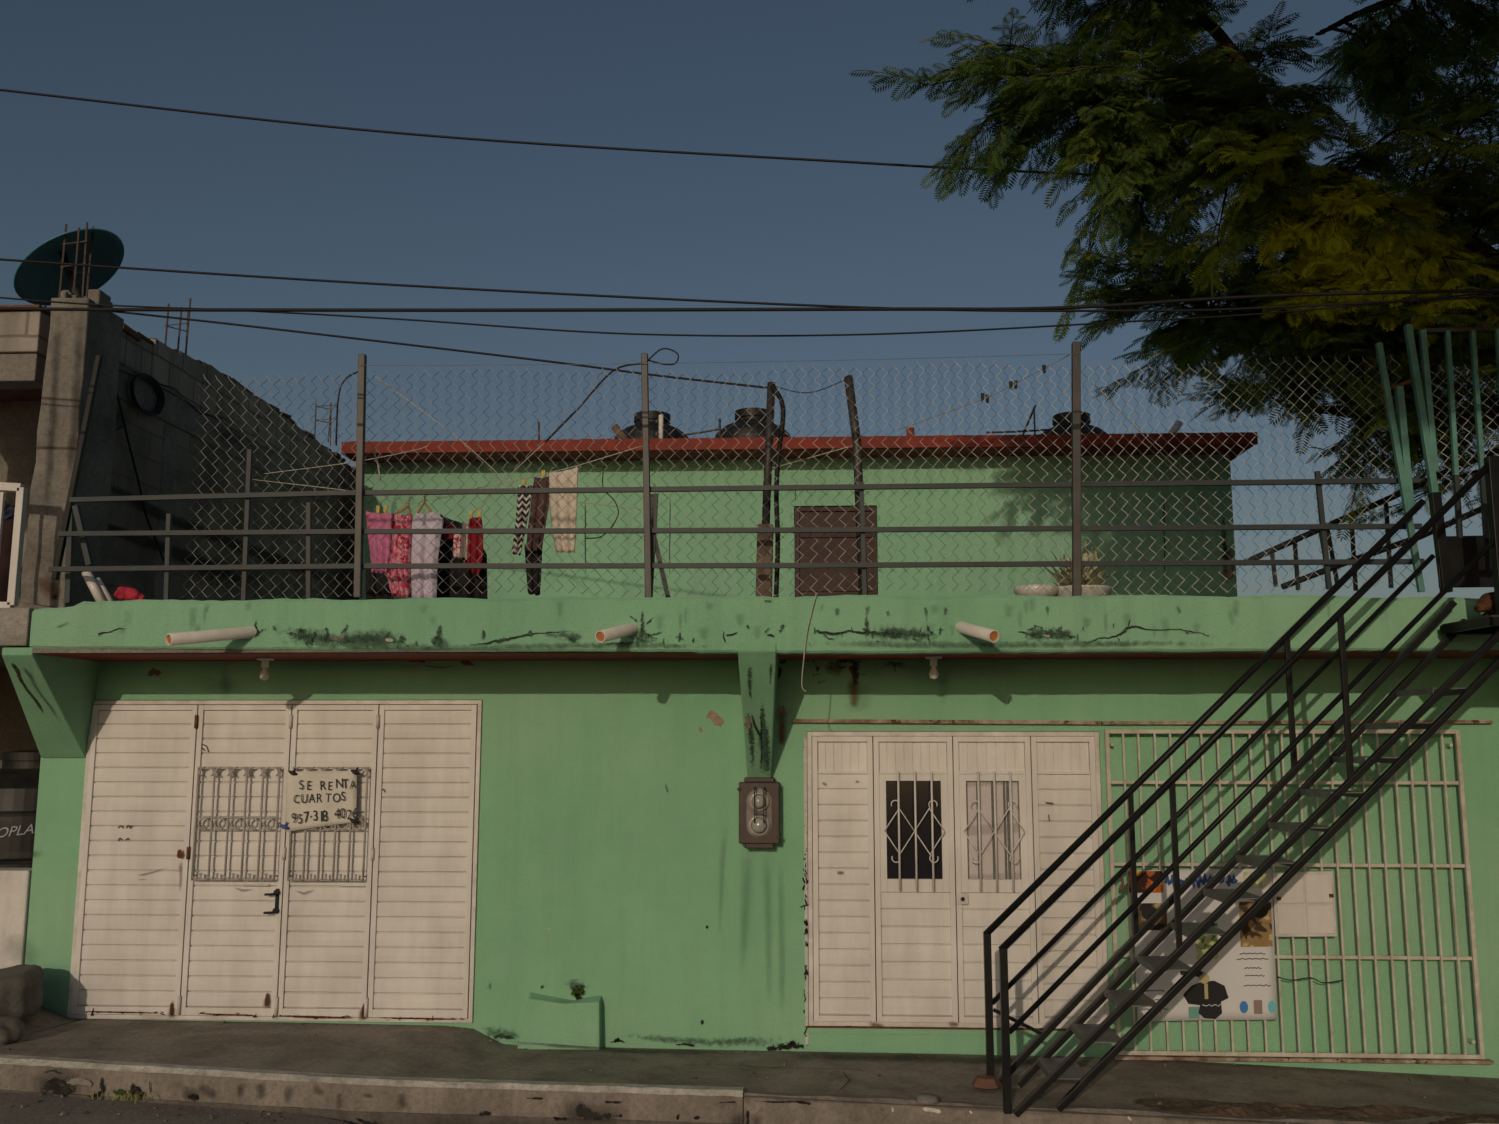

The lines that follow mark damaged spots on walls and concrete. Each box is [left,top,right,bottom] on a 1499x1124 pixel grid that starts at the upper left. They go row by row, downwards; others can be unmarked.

damp [332,613,694,649]
crack [469,630,565,645]
damp [851,623,1151,671]
crack [1086,620,1209,643]
damp [745,661,786,770]